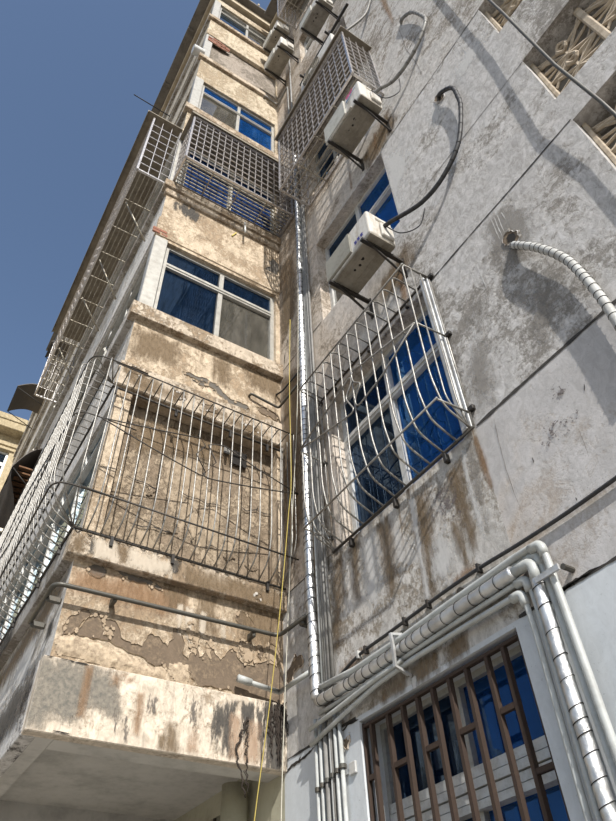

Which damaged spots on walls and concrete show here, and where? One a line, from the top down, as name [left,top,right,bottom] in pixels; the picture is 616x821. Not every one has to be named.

water stain [409,444,484,598]
water stain [0,560,282,741]
spalling [62,608,304,704]
water stain [207,701,288,771]